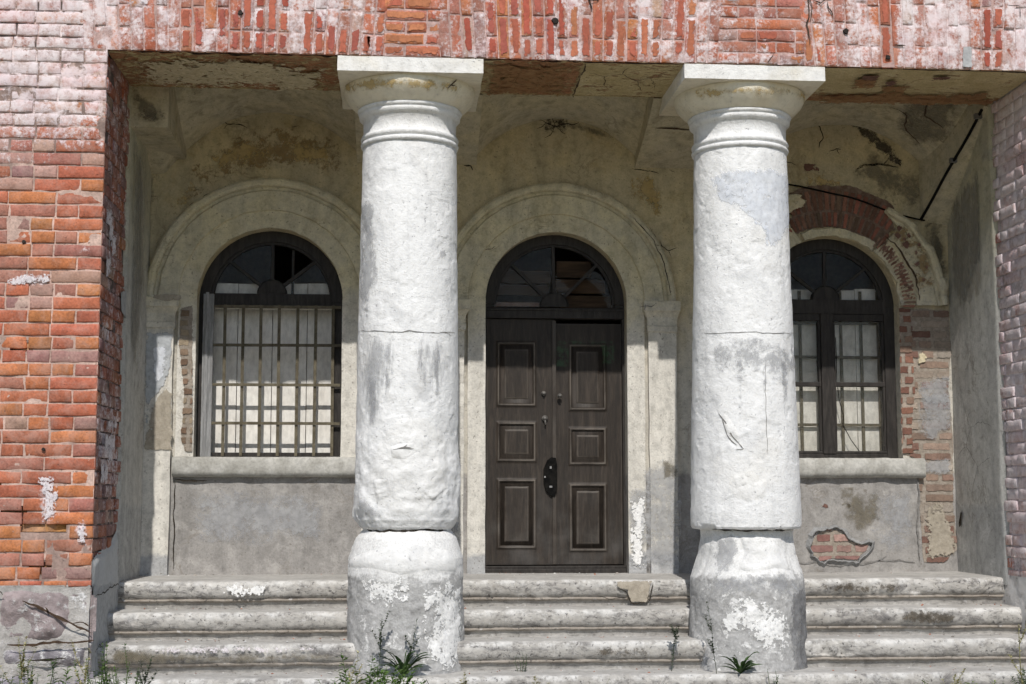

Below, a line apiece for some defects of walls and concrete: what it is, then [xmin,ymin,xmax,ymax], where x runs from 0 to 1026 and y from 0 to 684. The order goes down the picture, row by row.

water stain [181,128,339,204]
crack [819,126,896,170]
crack [891,103,943,143]
water stain [360,205,377,315]
spalling [711,169,957,571]
flaking render [630,497,647,567]
crack [0,591,103,675]
peeling [361,577,409,608]
peeling [422,580,462,671]
peeling [723,595,789,650]